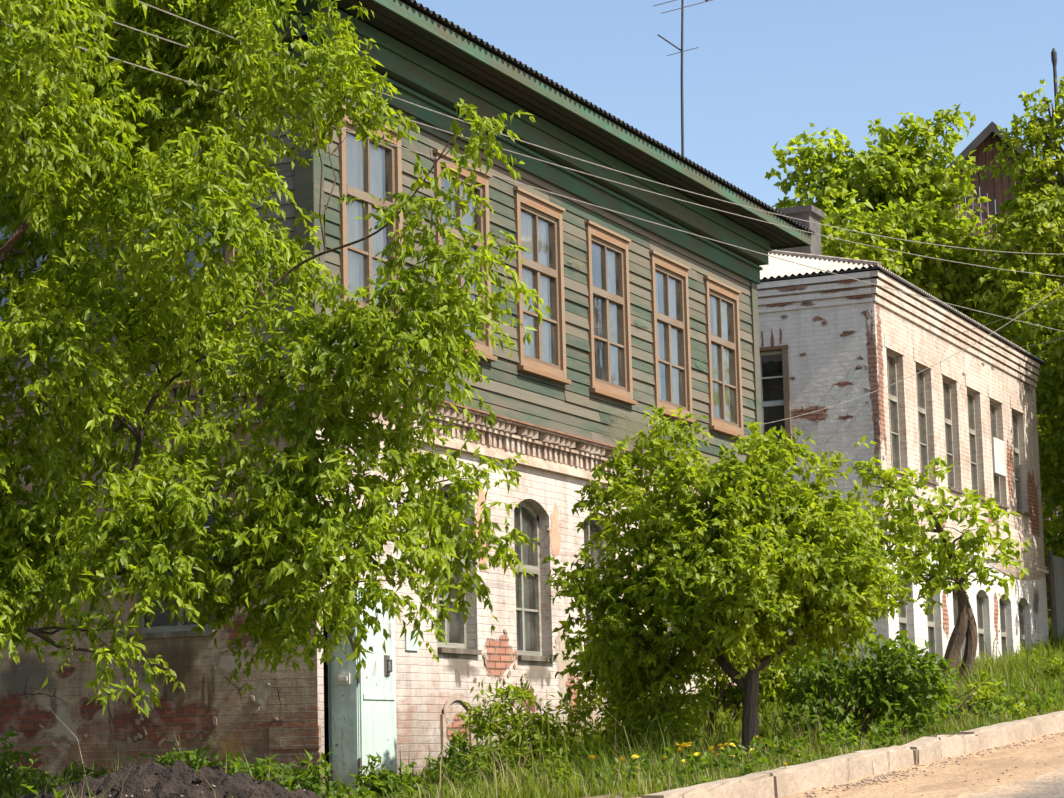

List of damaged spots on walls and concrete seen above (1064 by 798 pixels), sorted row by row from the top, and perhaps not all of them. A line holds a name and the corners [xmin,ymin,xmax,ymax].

spalling [766,278,887,466]
flaking render [547,503,560,556]
spalling [1007,439,1015,509]
spalling [1027,471,1039,537]
spalling [474,629,518,682]
spalling [0,672,219,778]
spalling [484,686,539,727]